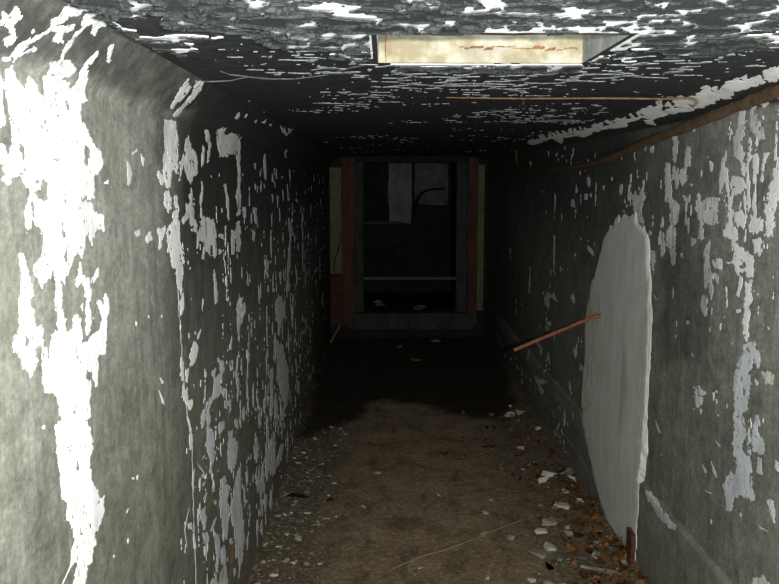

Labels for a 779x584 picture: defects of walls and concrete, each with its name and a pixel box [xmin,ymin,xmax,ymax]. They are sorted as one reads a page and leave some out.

peeling [0,6,23,47]
peeling [127,149,145,186]
peeling [571,171,605,217]
peeling [619,102,779,517]
peeling [134,78,342,584]
peeling [645,490,676,530]
peeling [767,499,776,523]